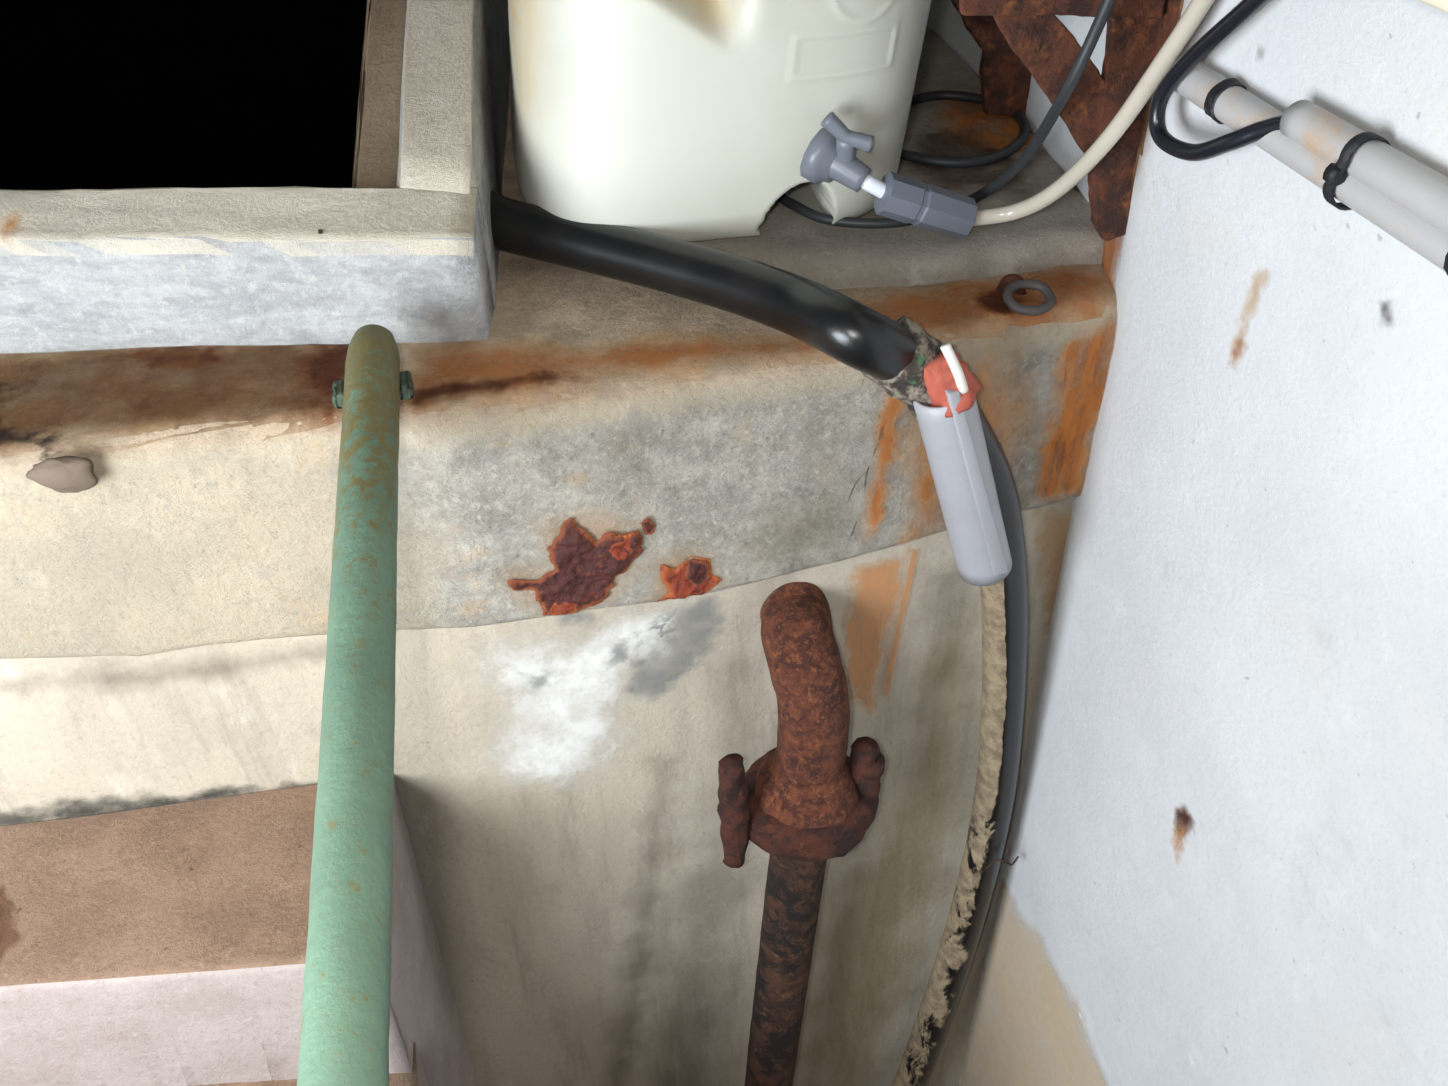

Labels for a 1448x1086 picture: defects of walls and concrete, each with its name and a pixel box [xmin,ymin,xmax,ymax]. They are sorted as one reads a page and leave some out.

corrosion [0,344,349,447]
corrosion [871,236,1121,498]
corrosion [1232,338,1242,359]
corrosion [869,396,901,527]
corrosion [919,474,933,516]
corrosion [847,539,918,707]
damp [501,611,673,785]
corrosion [1175,808,1191,848]
damp [0,889,18,957]